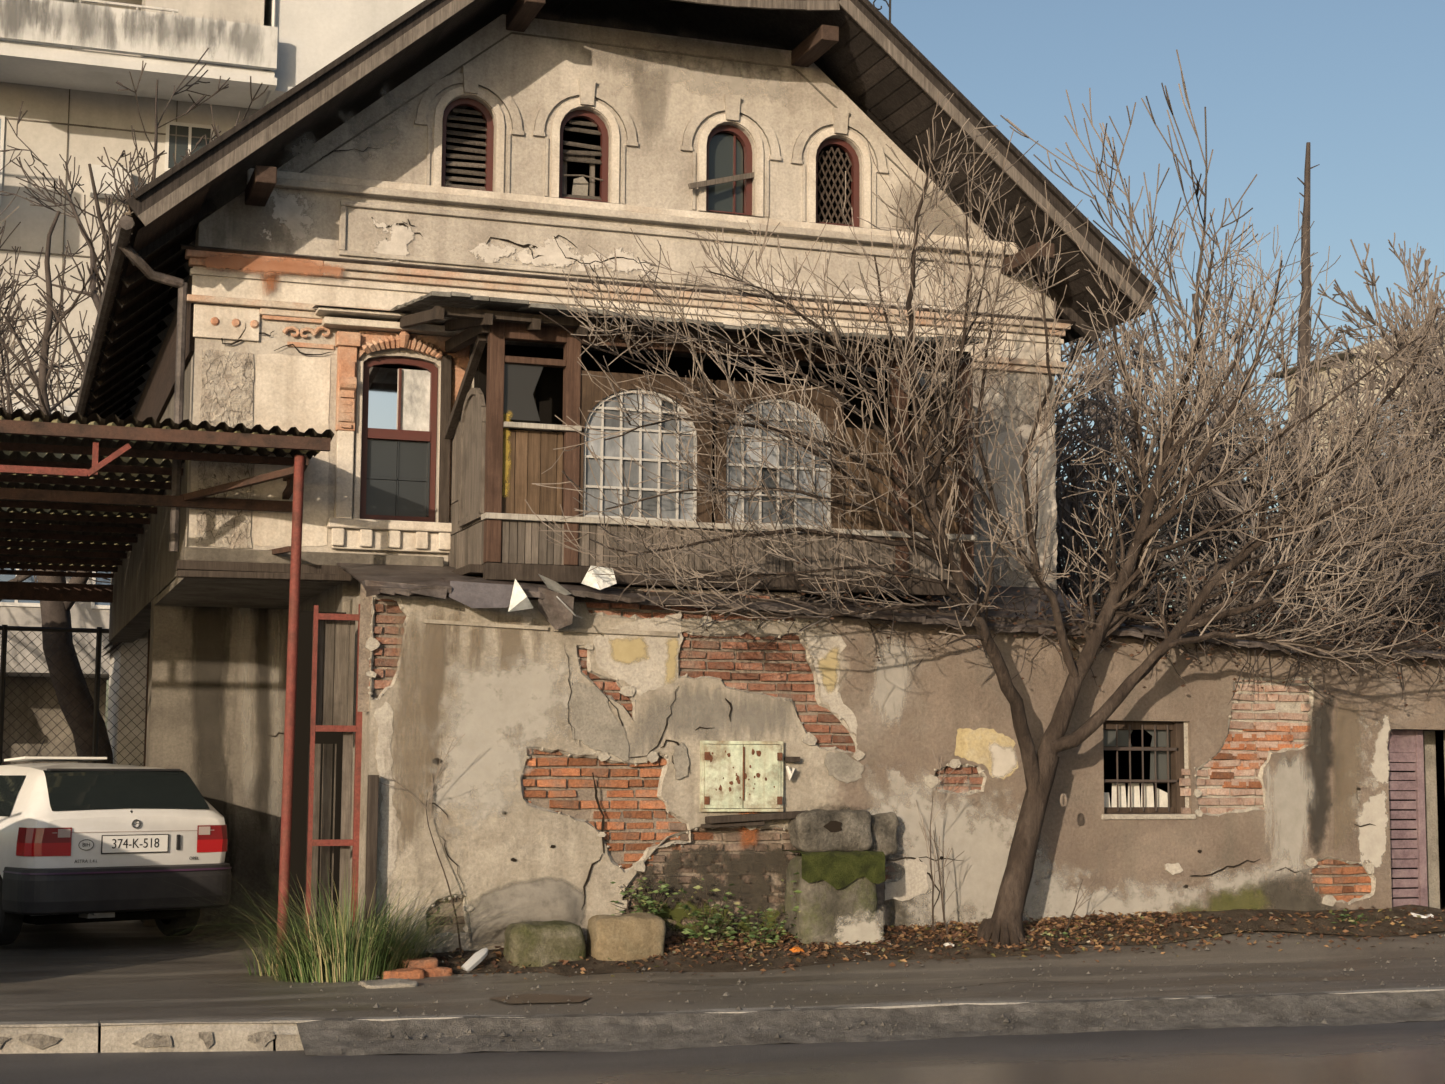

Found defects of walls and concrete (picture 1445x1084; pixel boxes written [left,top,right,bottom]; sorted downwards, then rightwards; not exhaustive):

flaking render [373,219,414,262]
flaking render [452,238,662,284]
flaking render [357,584,410,886]
crack [564,646,732,910]
flaking render [519,746,801,938]
flaking render [576,585,865,784]
leakage [835,785,1016,945]
flaking render [888,728,1018,797]
leakage [1023,697,1360,922]
flaking render [1179,675,1315,817]
flaking render [1305,715,1390,906]